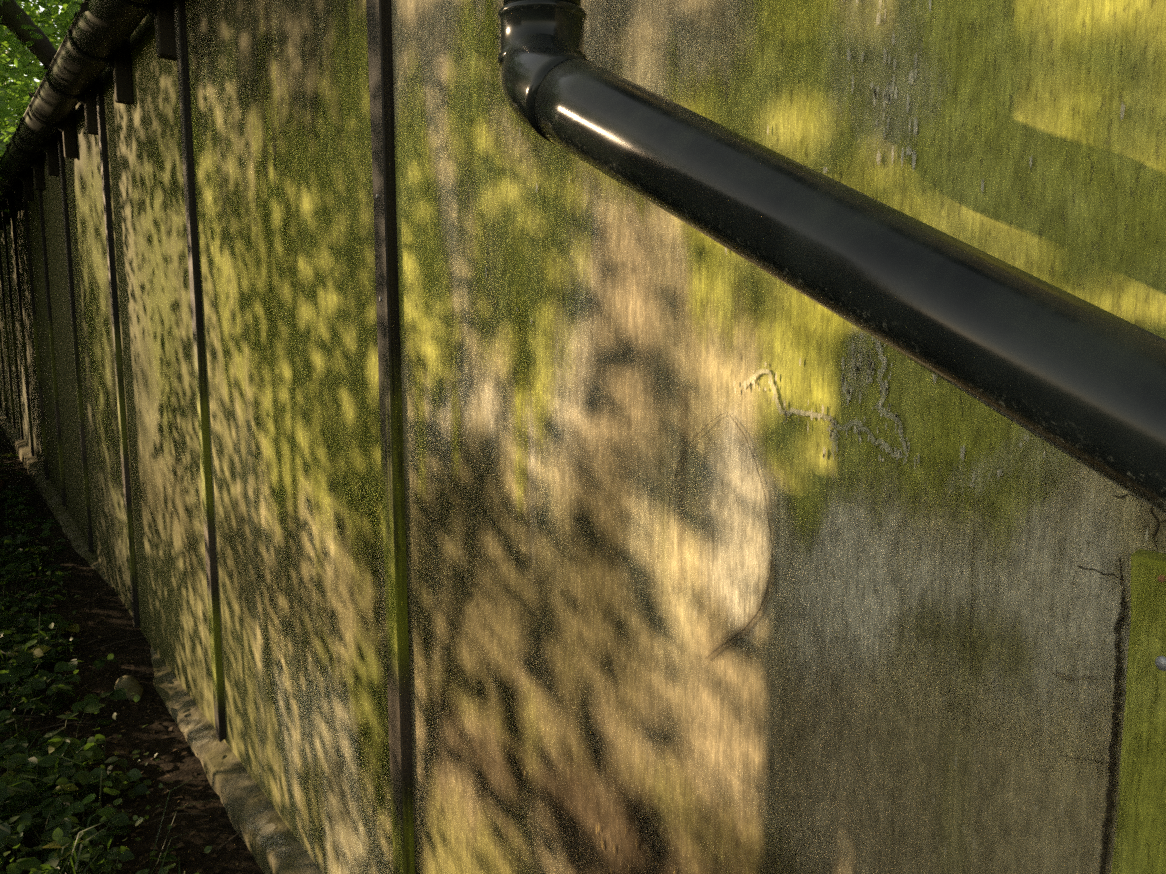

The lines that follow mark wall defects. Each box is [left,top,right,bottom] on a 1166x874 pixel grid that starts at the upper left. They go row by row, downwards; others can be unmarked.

damp [185,0,358,114]
damp [391,0,471,79]
damp [581,0,725,61]
crack [668,412,773,659]
damp [405,208,1127,874]
crack [1113,493,1166,550]